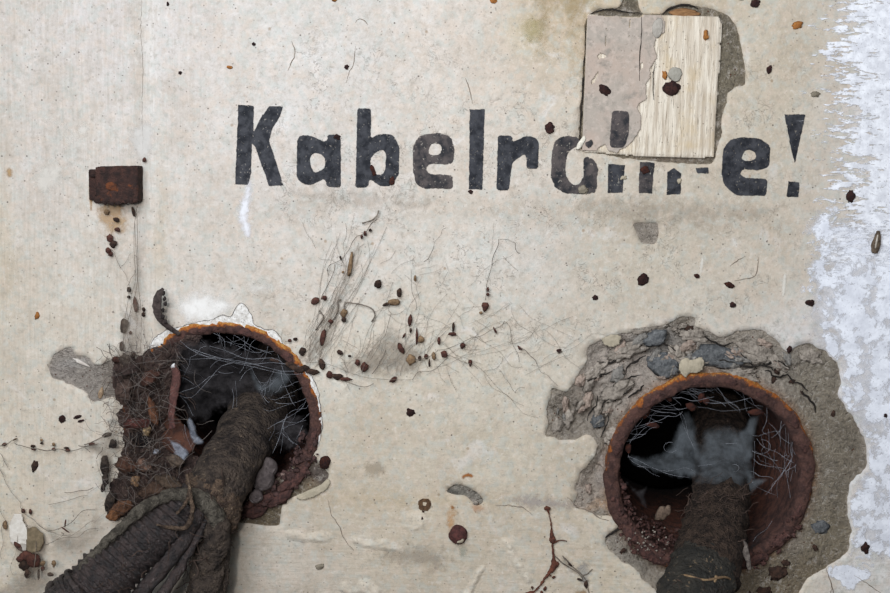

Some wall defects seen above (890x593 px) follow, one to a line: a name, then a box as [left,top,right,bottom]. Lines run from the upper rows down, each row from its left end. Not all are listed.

spalling [578,0,746,164]
corrosion [101,203,125,231]
corrosion [168,363,181,429]
spalling [545,207,890,593]